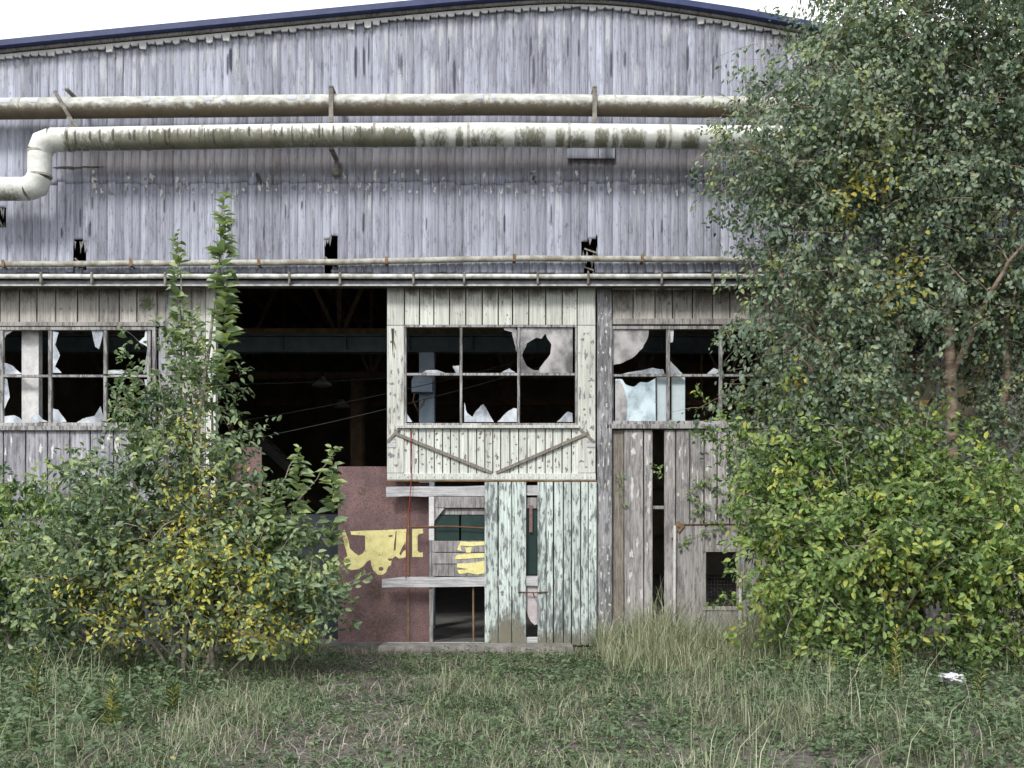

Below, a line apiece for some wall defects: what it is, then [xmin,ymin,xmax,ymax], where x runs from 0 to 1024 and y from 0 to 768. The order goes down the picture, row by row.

damp [515,129,666,148]
damp [682,132,699,149]
peeling [91,168,695,198]
peeling [388,330,466,469]
peeling [478,289,625,640]
peeling [626,433,652,513]
peeling [666,430,736,521]